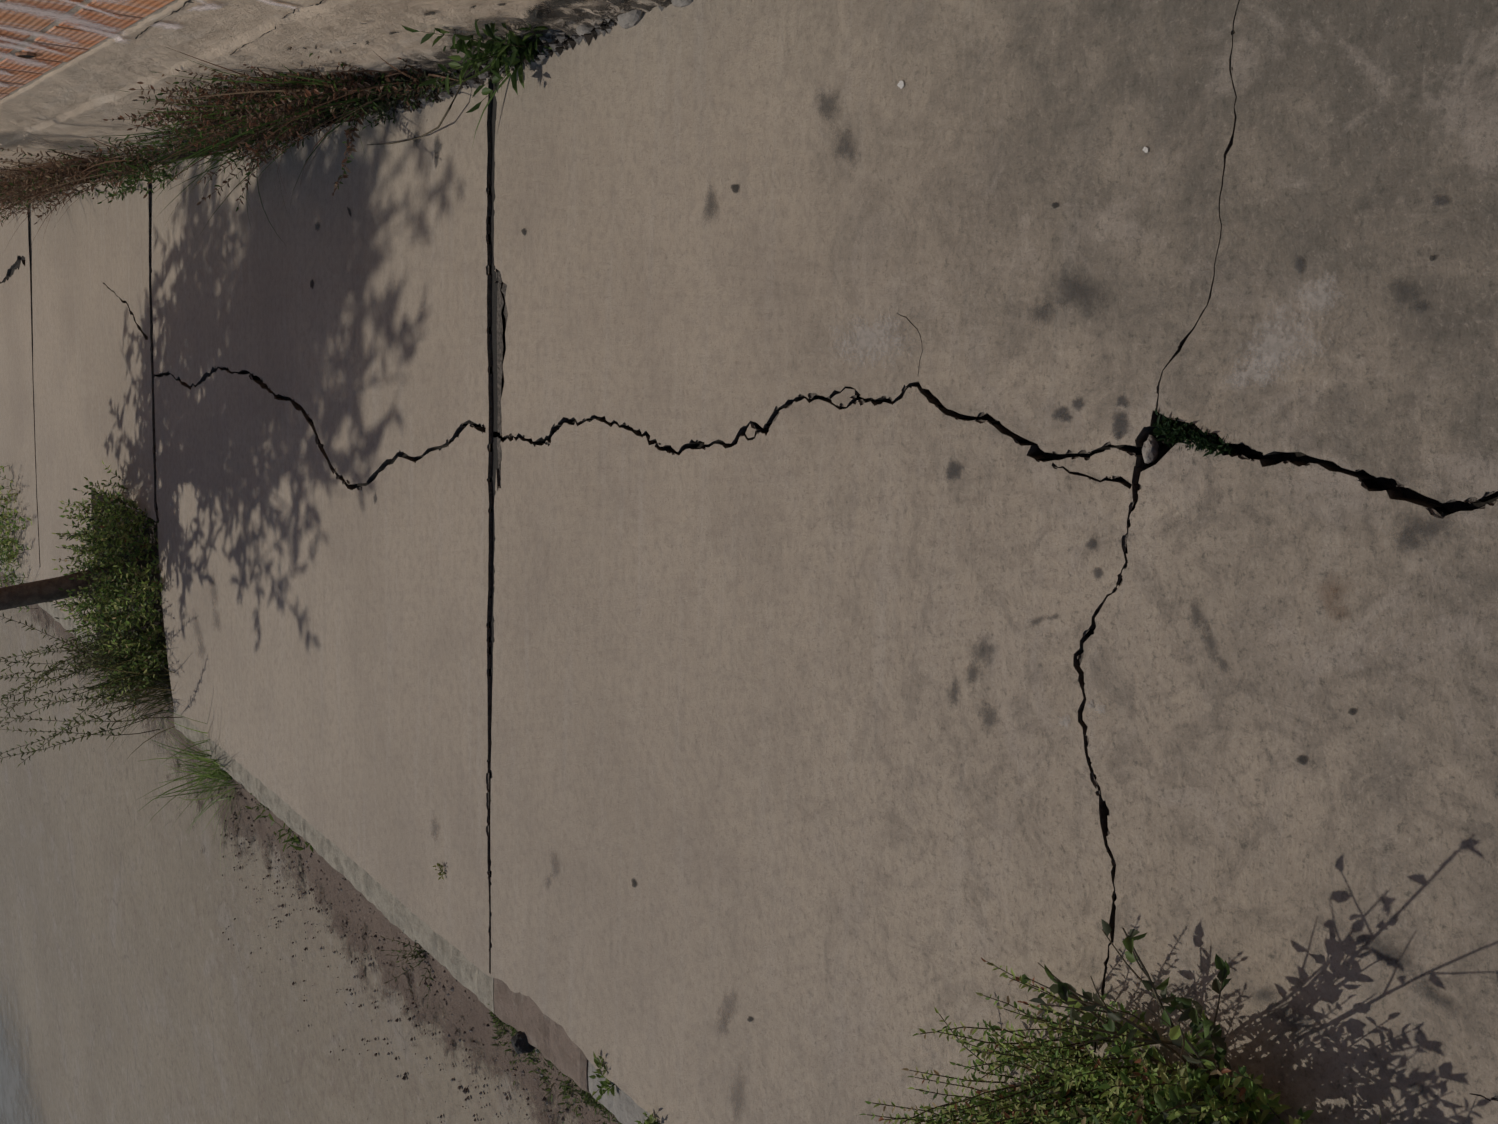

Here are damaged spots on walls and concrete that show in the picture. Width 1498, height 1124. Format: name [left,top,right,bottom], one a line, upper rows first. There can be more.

crack [135,0,194,39]
crack [0,255,25,284]
crack [103,283,148,340]
crack [156,0,1498,996]
crack [1469,1093,1498,1101]